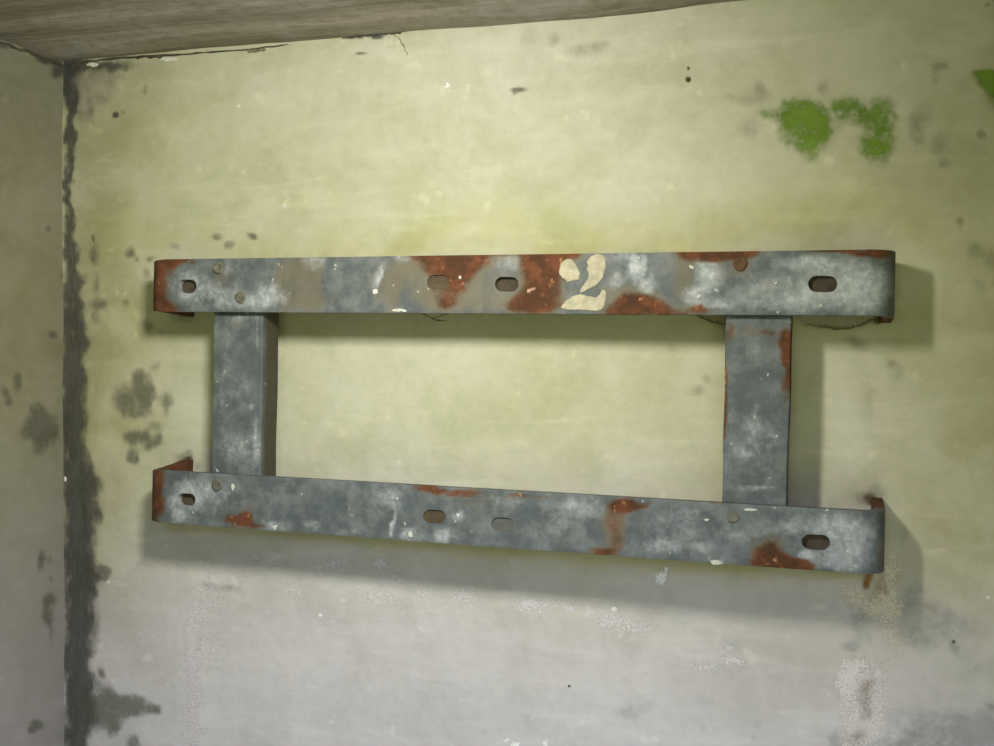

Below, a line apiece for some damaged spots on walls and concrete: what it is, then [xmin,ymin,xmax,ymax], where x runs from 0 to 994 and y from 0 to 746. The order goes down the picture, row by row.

water stain [25,97,160,746]
water stain [834,550,909,746]